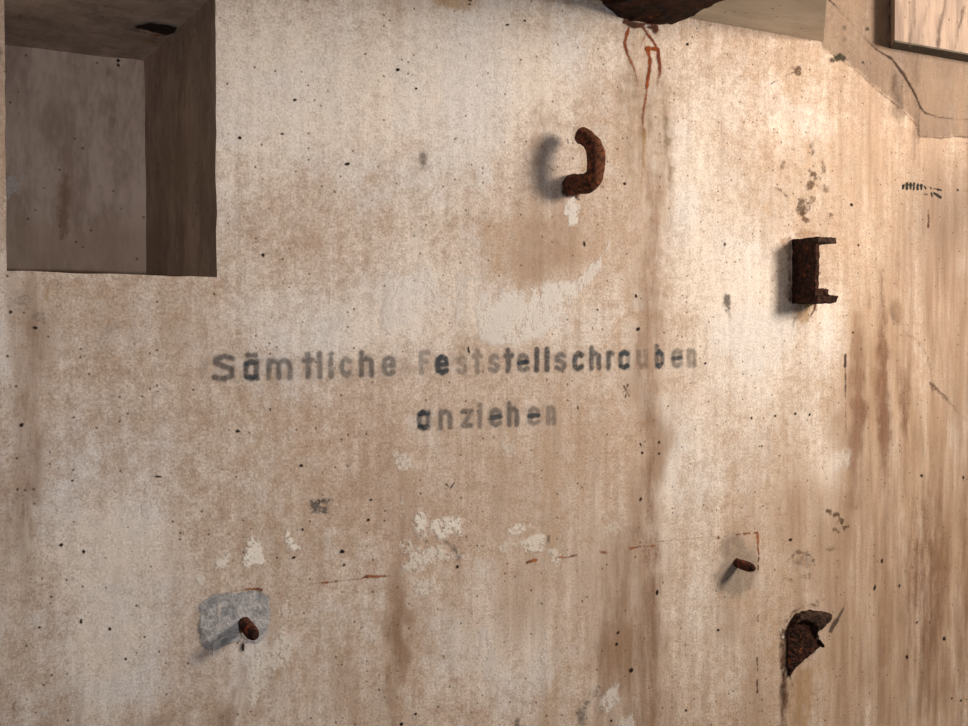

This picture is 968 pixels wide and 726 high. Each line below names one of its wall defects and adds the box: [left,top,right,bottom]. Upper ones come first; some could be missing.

rust [623,19,661,140]
rust [799,288,829,319]
damp [844,354,865,417]
damp [878,341,889,439]